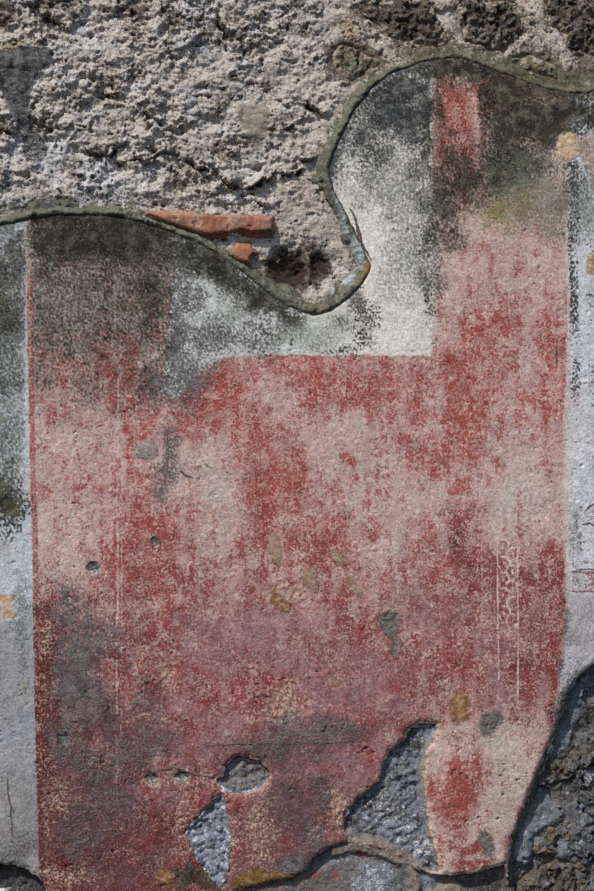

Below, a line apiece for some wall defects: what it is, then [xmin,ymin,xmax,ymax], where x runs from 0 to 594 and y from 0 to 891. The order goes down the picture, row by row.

peeling [0,0,594,316]
spalling [0,864,45,891]
spalling [174,770,190,782]
spalling [185,755,270,887]
peeling [245,664,594,891]